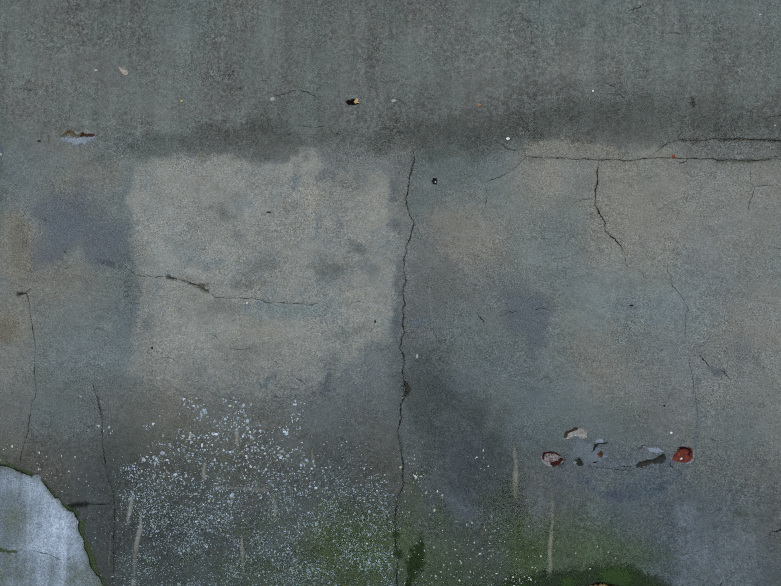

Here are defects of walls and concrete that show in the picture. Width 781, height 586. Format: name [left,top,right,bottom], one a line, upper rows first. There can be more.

spalling [60,130,97,146]
crack [485,134,781,276]
crack [394,152,415,586]
spalling [541,427,695,472]
peeling [0,453,105,586]
leakage [127,498,142,586]
spalling [503,563,670,586]